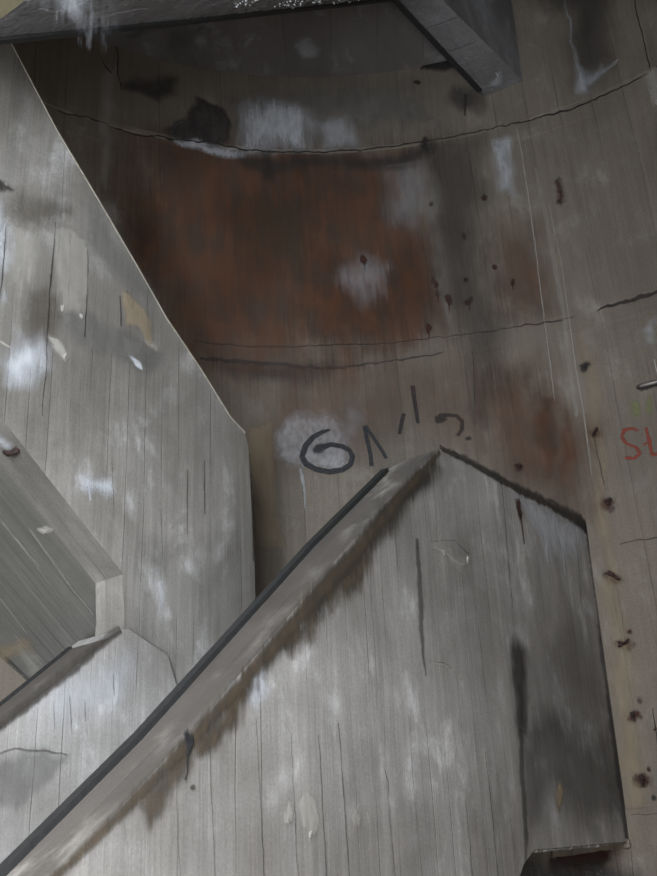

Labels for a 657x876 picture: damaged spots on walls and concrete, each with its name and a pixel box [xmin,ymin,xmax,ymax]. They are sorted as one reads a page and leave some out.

leakage [247,104,302,144]
leakage [178,139,432,170]
crack [58,0,657,153]
corrosion [137,145,452,359]
crack [192,316,574,369]
crack [598,290,657,311]
leakage [0,627,122,729]
leakage [51,445,596,876]
leakage [597,607,628,839]